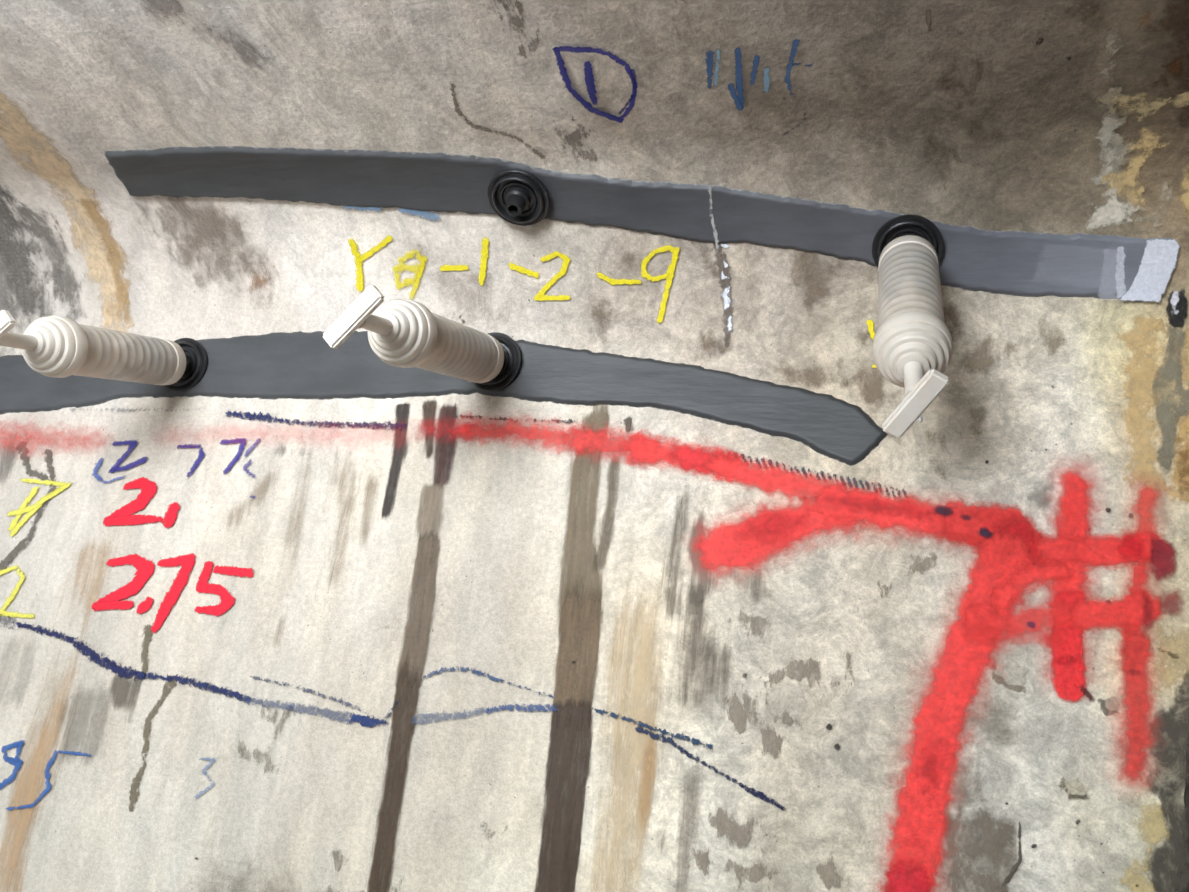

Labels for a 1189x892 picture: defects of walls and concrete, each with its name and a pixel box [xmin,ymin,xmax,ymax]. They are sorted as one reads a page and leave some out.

water stain [582,405,609,432]
crack [712,243,733,347]
water stain [368,401,456,892]
water stain [534,447,618,892]